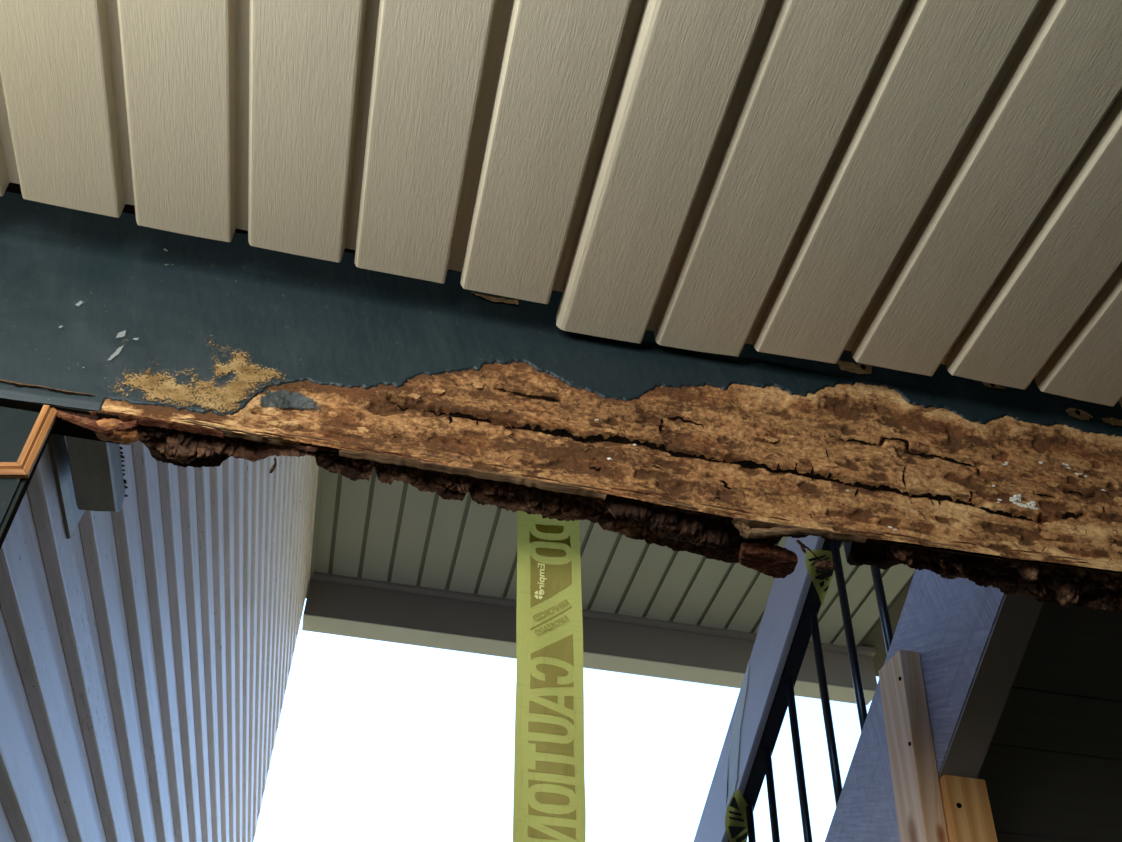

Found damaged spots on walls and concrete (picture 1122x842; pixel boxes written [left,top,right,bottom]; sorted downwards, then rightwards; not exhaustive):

peeling [113,335,288,415]
peeling [408,389,445,401]
peeling [671,411,692,432]
spalling [1066,408,1122,426]
crack [391,388,1105,523]